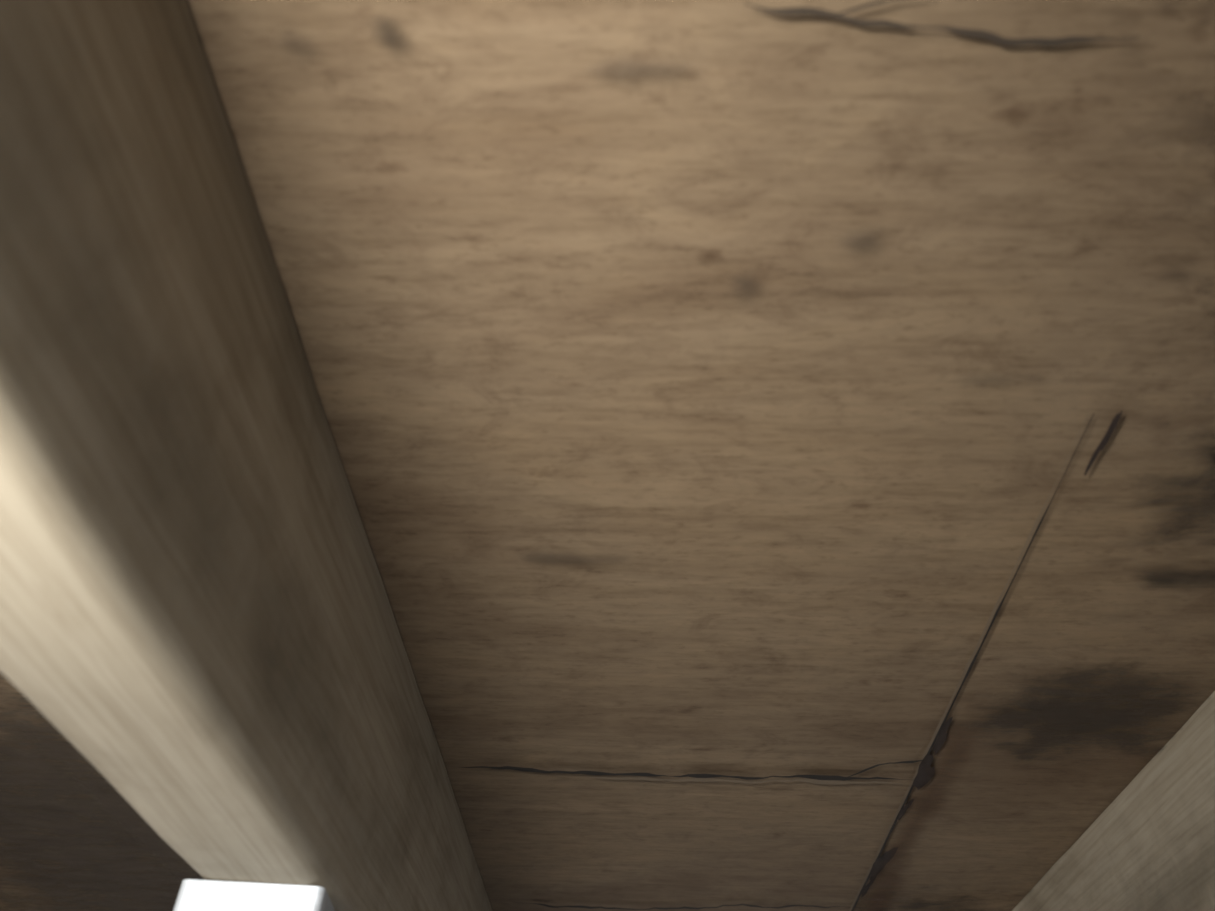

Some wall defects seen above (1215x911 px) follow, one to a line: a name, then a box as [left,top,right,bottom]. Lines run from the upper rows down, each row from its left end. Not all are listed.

crack [744,0,1140,46]
crack [462,410,1123,911]